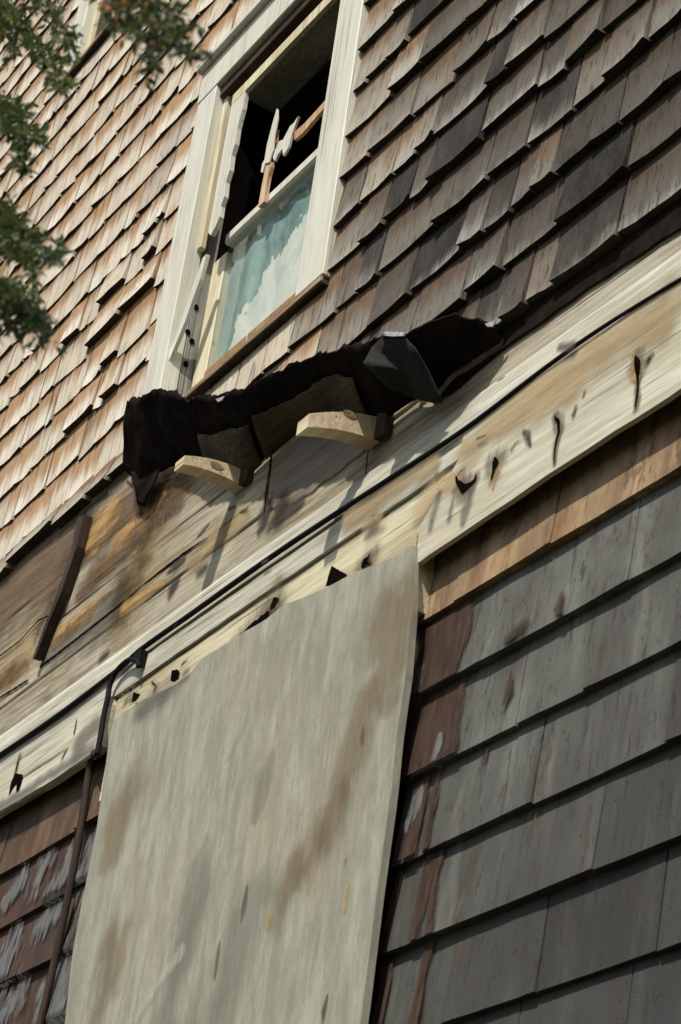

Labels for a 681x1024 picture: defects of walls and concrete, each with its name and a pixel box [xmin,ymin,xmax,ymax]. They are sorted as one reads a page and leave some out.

crack [453,454,504,499]
crack [553,412,563,466]
crack [634,348,653,412]
leakage [0,466,189,693]
peeling [370,597,474,1024]
peeling [0,834,96,1024]